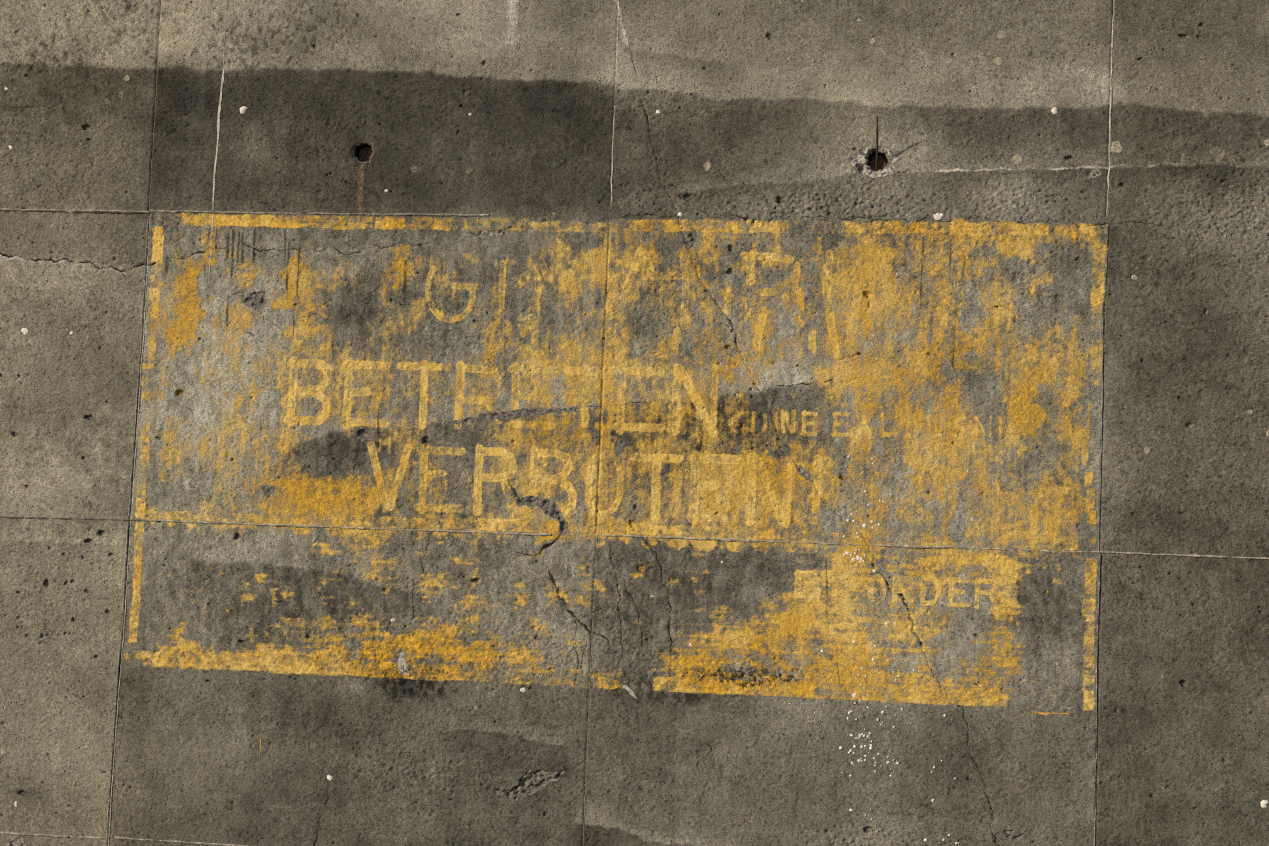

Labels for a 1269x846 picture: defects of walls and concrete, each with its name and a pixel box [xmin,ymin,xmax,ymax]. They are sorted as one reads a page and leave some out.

crack [0,242,431,276]
spalling [242,290,266,309]
spalling [445,407,577,425]
spalling [356,426,381,448]
crack [601,51,1162,846]
spalling [516,496,568,536]
crack [521,539,673,696]
spalling [481,769,564,800]